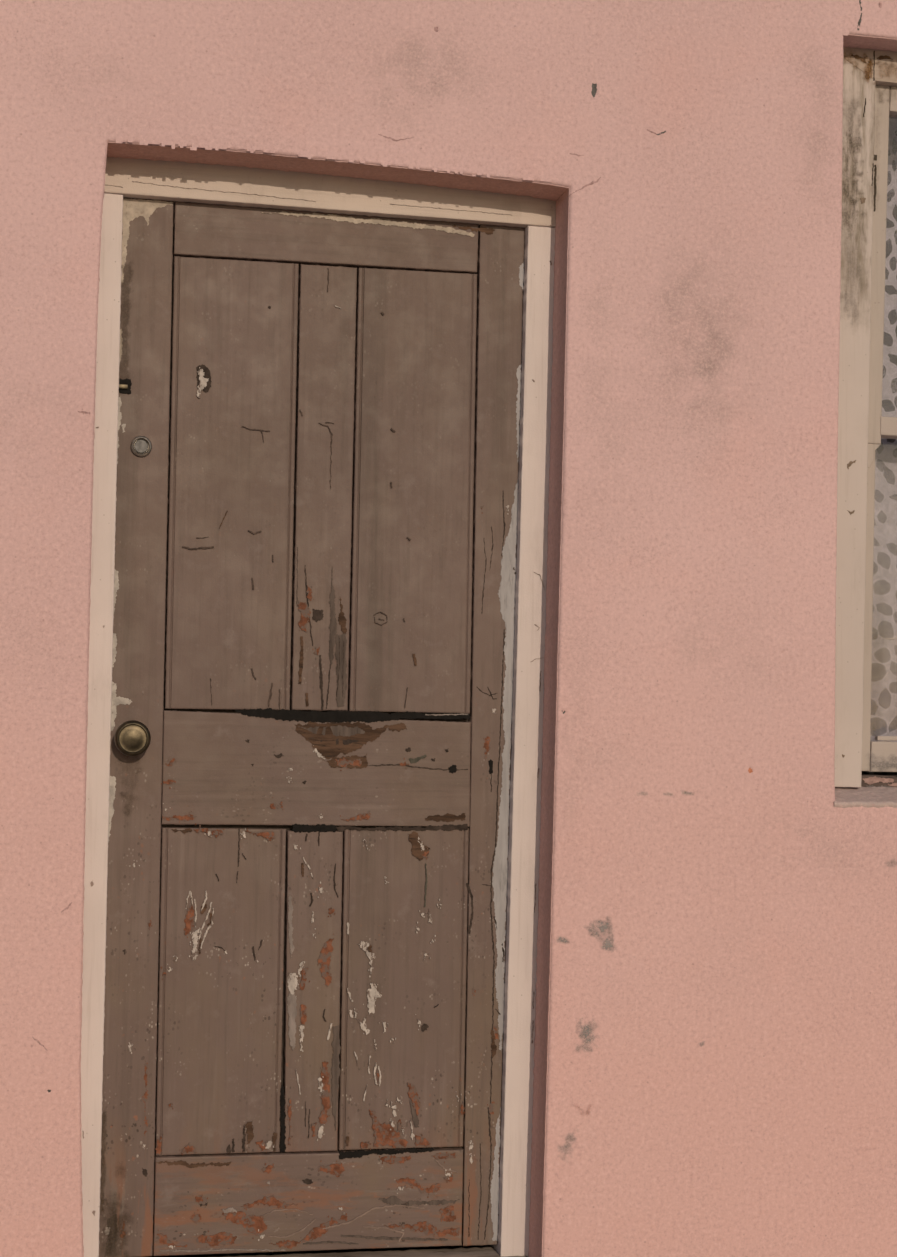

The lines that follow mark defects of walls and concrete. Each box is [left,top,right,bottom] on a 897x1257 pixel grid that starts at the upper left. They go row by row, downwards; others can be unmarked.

crack [857,0,875,117]
crack [870,155,878,212]
peeling [196,364,212,398]
peeling [295,565,407,771]
peeling [142,813,475,1252]
peeling [490,1025,499,1058]